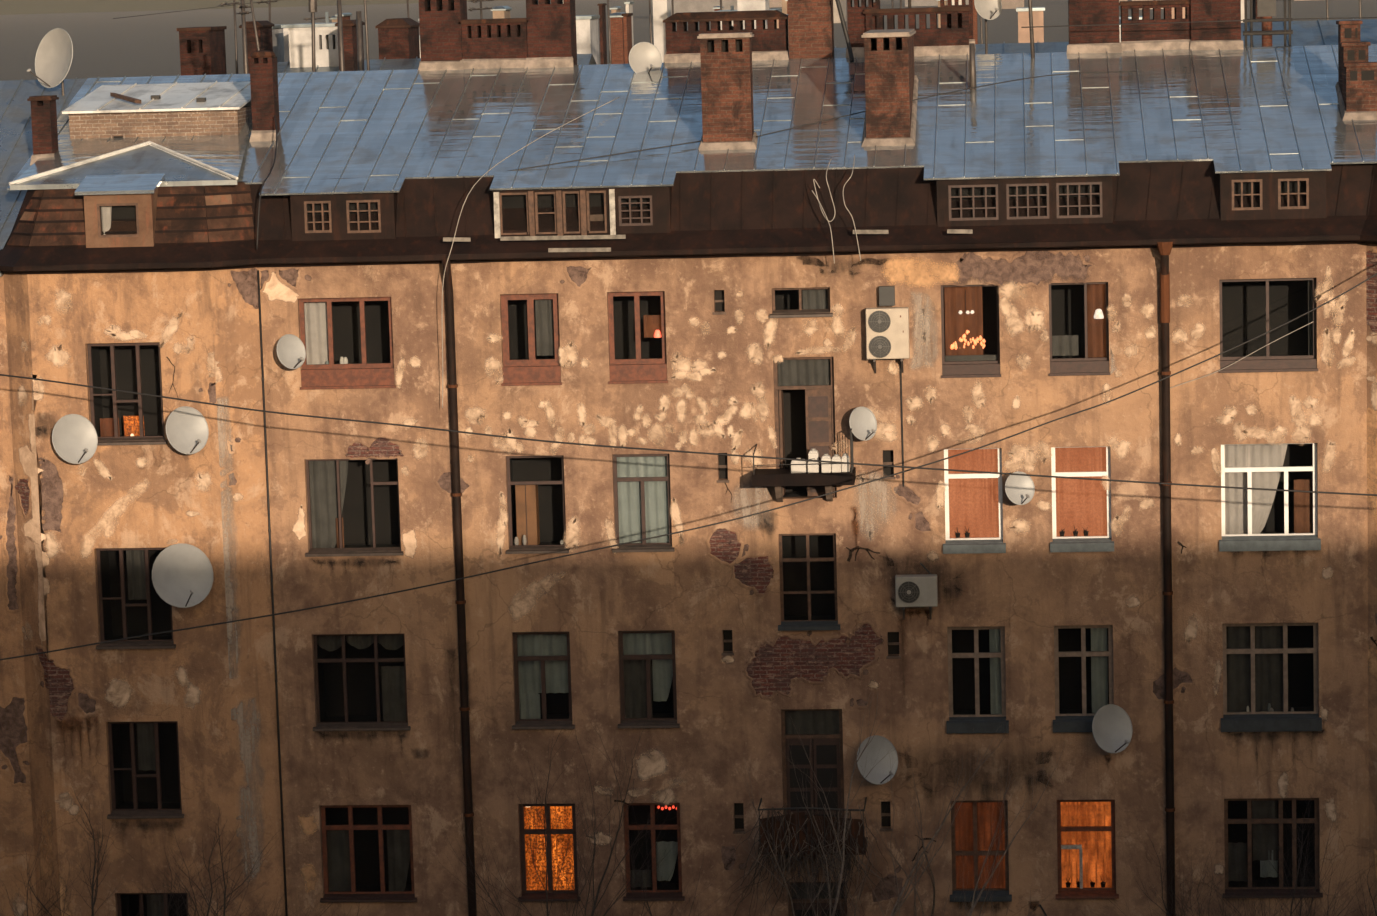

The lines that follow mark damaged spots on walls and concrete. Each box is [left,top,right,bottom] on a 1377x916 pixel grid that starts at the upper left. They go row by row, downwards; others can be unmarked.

flaking render [1316,248,1377,368]
peeling [396,357,421,389]
flaking render [344,419,427,475]
spalling [0,455,132,724]
peeling [497,492,507,556]
peeling [565,517,579,551]
peeling [605,520,618,549]
peeling [671,498,685,545]
flaking render [705,524,776,598]
flaking render [722,620,885,700]
spalling [0,693,31,787]
peeling [594,750,686,804]